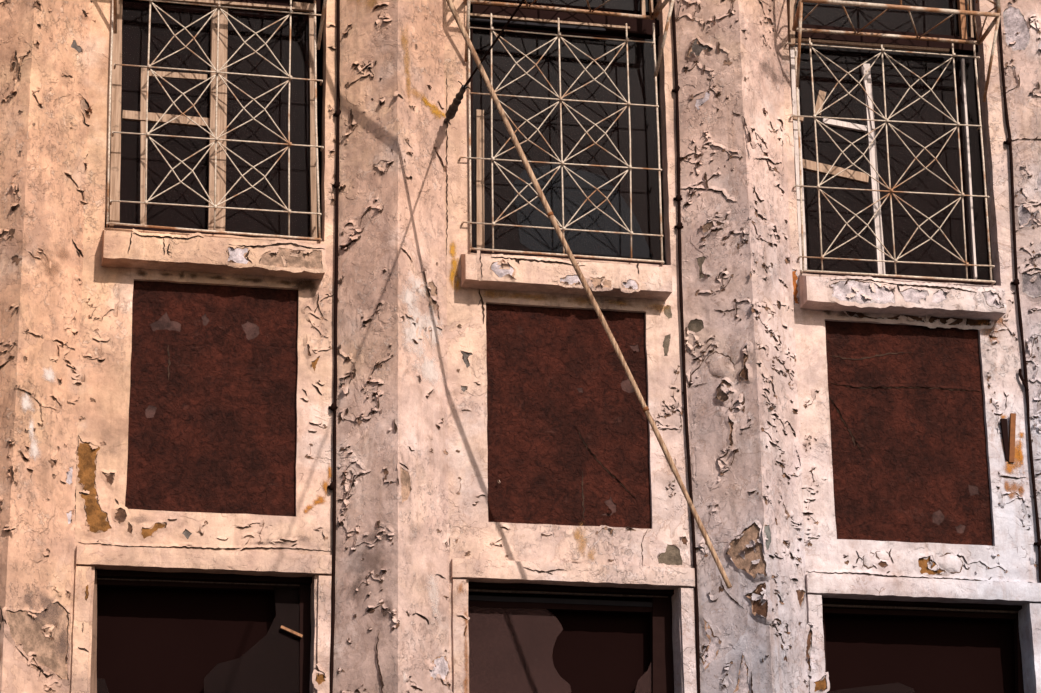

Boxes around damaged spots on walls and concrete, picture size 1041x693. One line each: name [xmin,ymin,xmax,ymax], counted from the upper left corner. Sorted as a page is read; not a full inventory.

peeling [750,107,785,195]
peeling [11,248,52,269]
peeling [487,258,518,282]
peeling [826,165,1041,442]
peeling [0,298,118,486]
spalling [650,301,719,433]
flaking render [48,416,208,545]
peeling [694,200,830,693]
corrosion [1003,433,1024,498]
peeling [996,468,1041,530]
spalling [654,535,709,568]
peeling [957,546,1008,575]